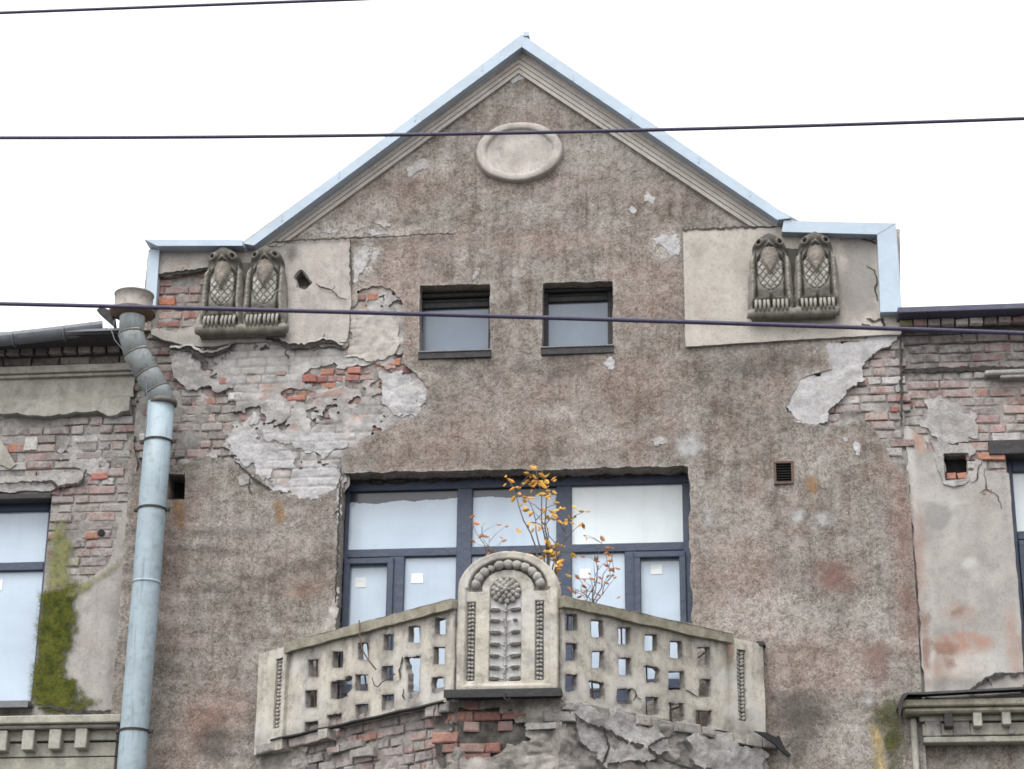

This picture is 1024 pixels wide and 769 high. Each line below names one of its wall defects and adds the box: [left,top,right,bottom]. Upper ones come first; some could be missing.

crack [272,233,456,300]
peeling [651,233,681,257]
crack [861,239,1024,426]
peeling [0,440,16,469]
spalling [129,383,147,472]
spalling [144,249,428,523]
flaking render [786,336,915,470]
crack [971,461,1001,504]
peeling [572,702,670,769]
peeling [684,732,769,769]